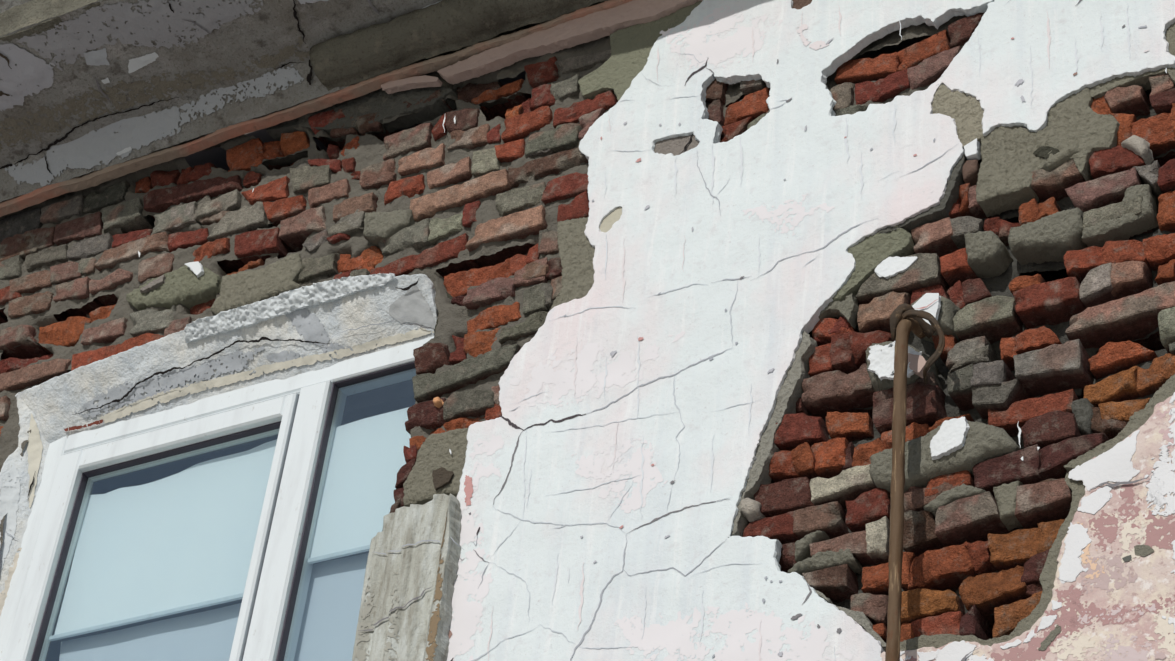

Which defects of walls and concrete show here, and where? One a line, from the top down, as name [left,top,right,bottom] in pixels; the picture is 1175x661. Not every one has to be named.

spalling [792,0,812,9]
crack [0,97,179,174]
crack [617,54,714,103]
crack [680,134,727,210]
spalling [705,79,770,142]
crack [882,143,959,179]
crack [72,279,434,415]
spalling [0,0,702,615]
spalling [731,13,1175,661]
crack [370,218,877,661]
crack [1090,471,1154,490]
crack [358,587,431,631]